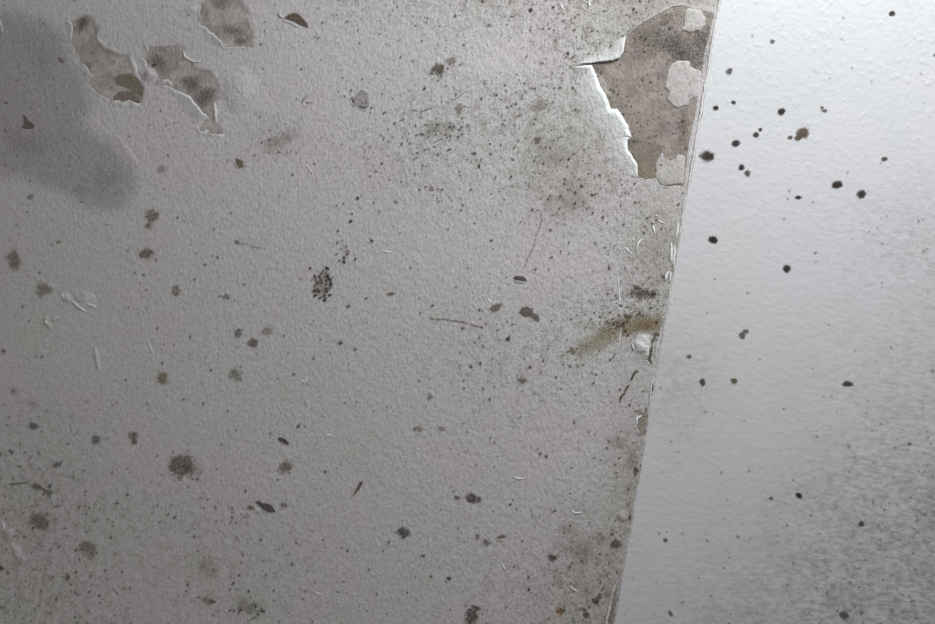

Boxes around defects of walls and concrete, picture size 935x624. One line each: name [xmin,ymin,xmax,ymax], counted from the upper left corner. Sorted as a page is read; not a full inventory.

peeling [66,16,224,139]
peeling [188,0,253,51]
peeling [278,9,308,28]
peeling [570,0,721,366]
peeling [623,377,655,568]